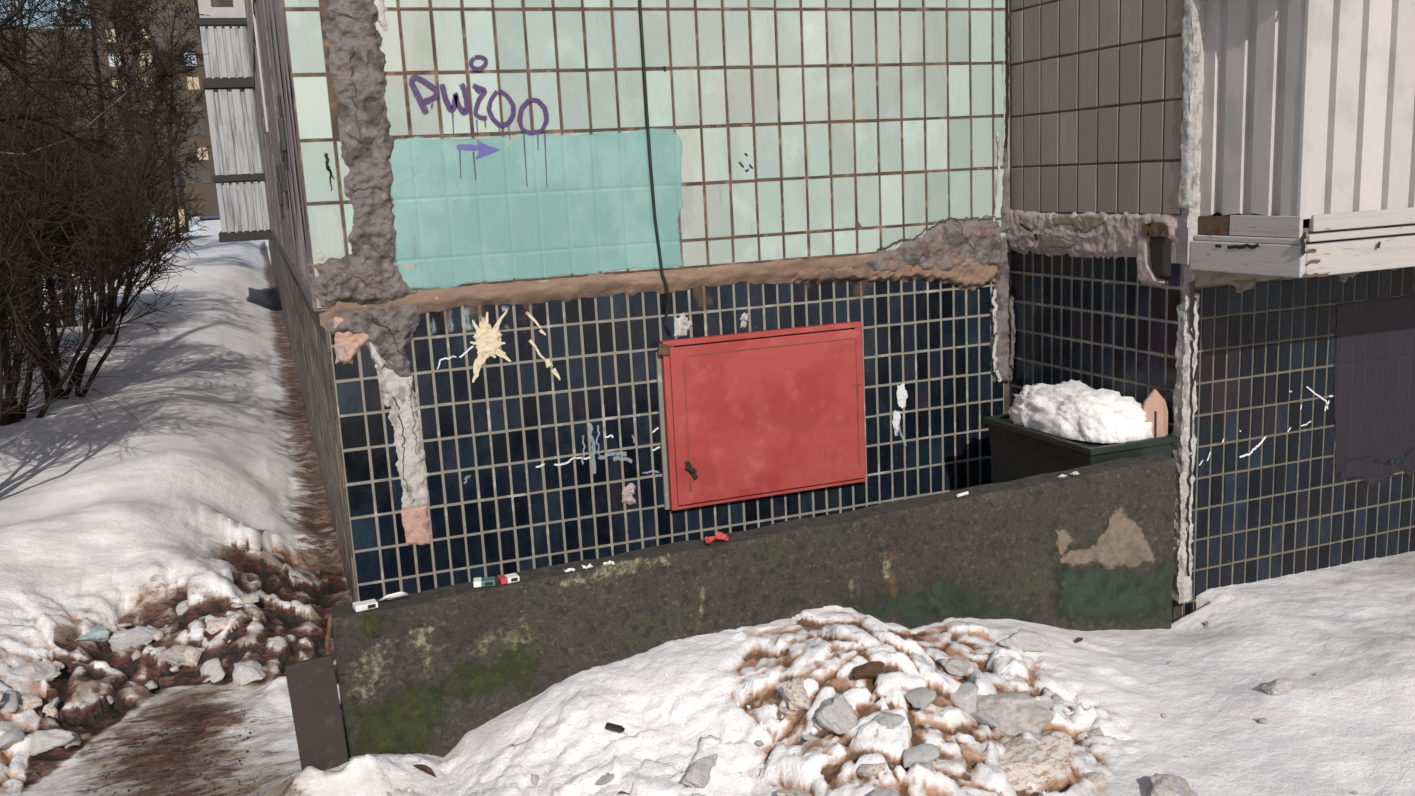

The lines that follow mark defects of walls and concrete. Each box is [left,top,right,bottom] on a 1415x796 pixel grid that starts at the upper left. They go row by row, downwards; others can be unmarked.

peeling [377,0,388,31]
peeling [325,303,432,545]
peeling [790,0,1360,606]